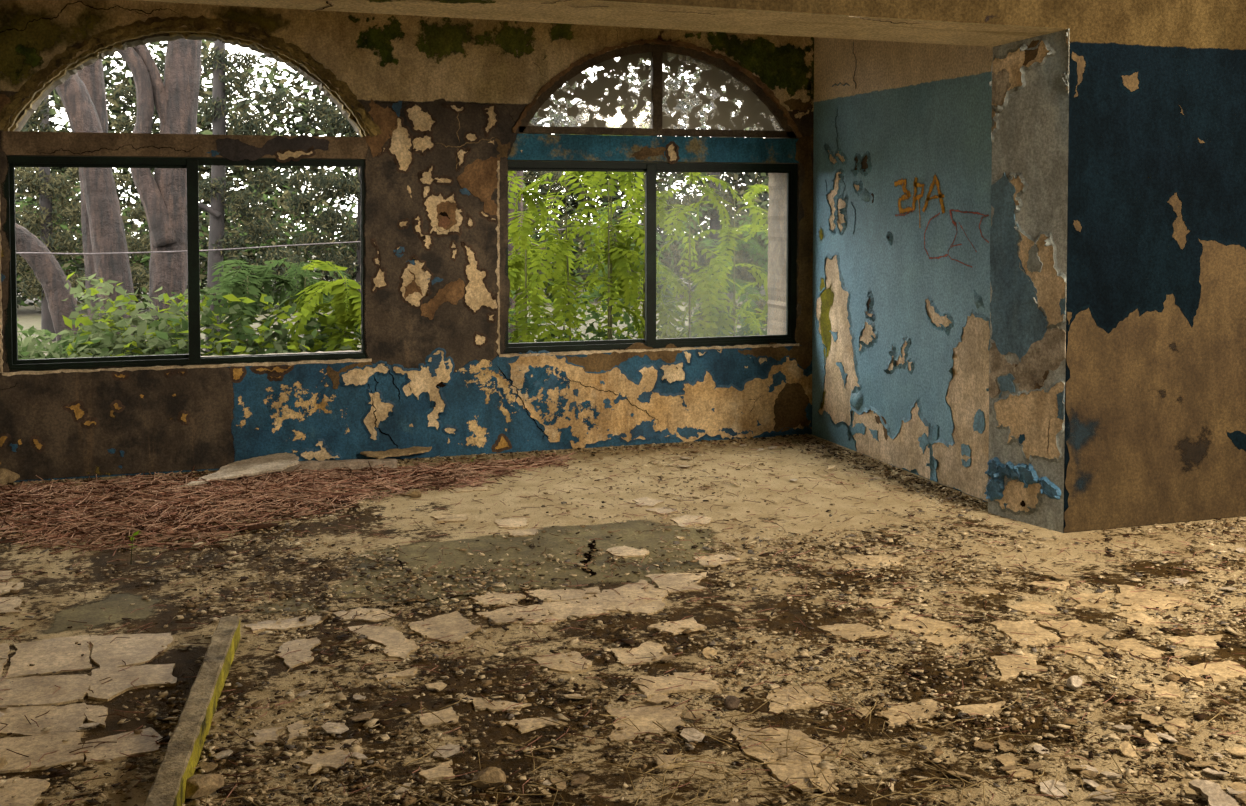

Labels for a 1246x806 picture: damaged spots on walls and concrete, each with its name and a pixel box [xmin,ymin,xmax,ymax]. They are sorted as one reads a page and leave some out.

peeling [989,29,1089,142]
peeling [1118,68,1142,96]
peeling [229,98,1246,533]
peeling [0,432,46,464]